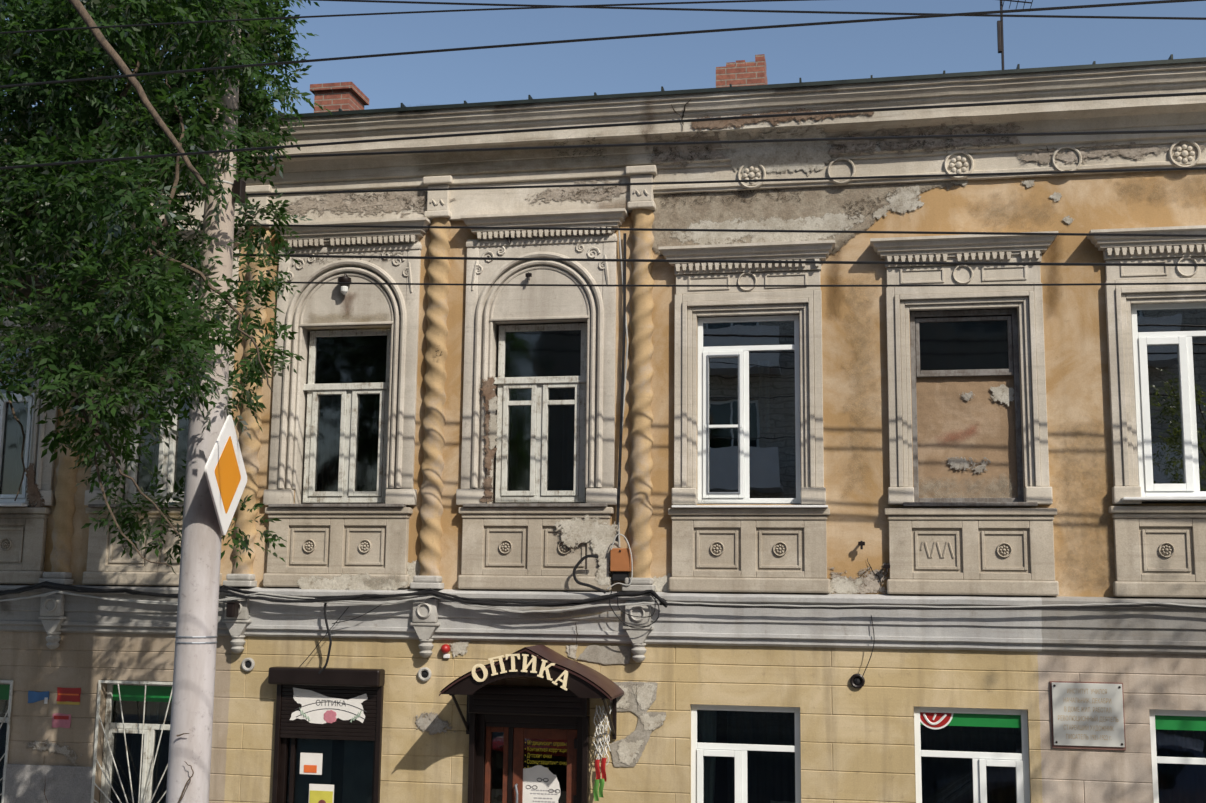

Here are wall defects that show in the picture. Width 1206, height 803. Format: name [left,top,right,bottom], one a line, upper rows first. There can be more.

peeling [525,177,630,205]
peeling [647,107,1206,256]
flaking render [479,376,499,503]
peeling [554,514,621,585]
peeling [829,563,889,595]
peeling [565,645,632,665]
peeling [414,709,455,735]
spalling [609,681,666,767]